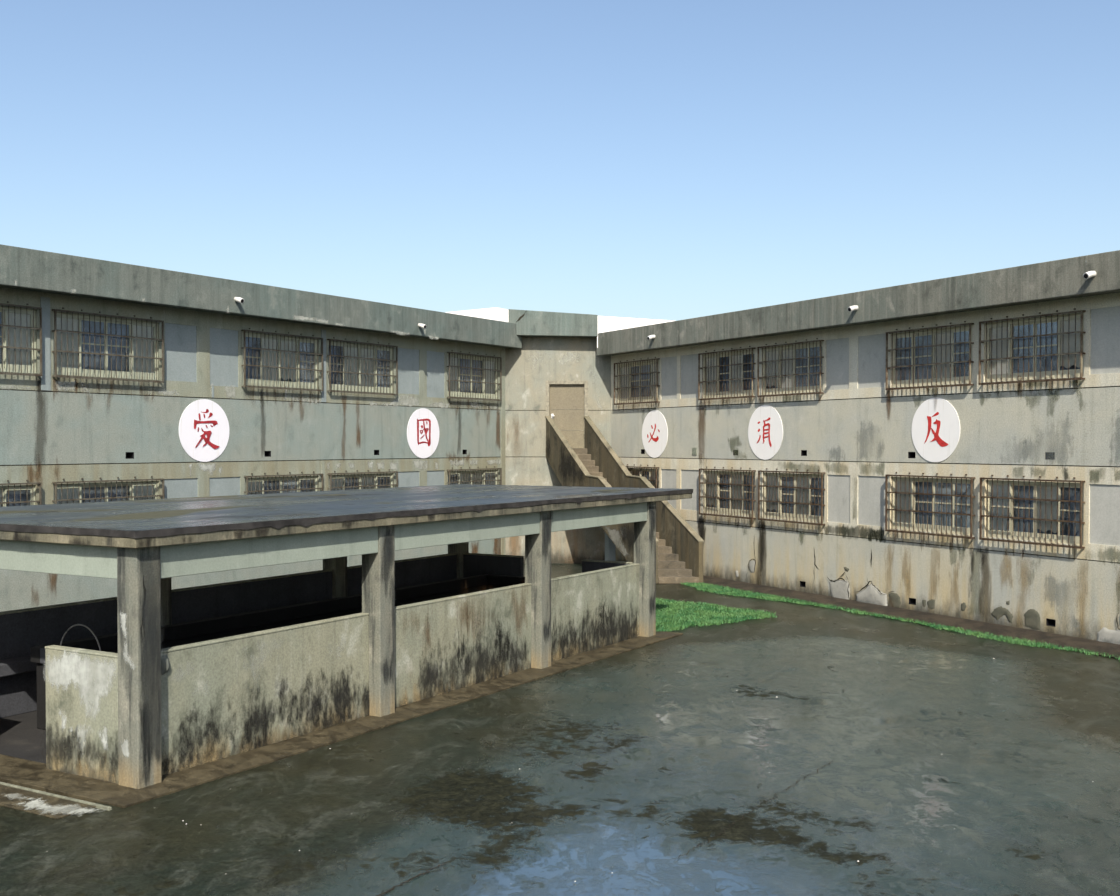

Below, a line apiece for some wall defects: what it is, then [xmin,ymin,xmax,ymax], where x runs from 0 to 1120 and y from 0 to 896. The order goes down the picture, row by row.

peeling [827,567,850,600]
damp [971,552,990,614]
peeling [1097,612,1120,645]
damp [44,727,118,769]
damp [140,671,370,784]
crack [376,861,449,896]